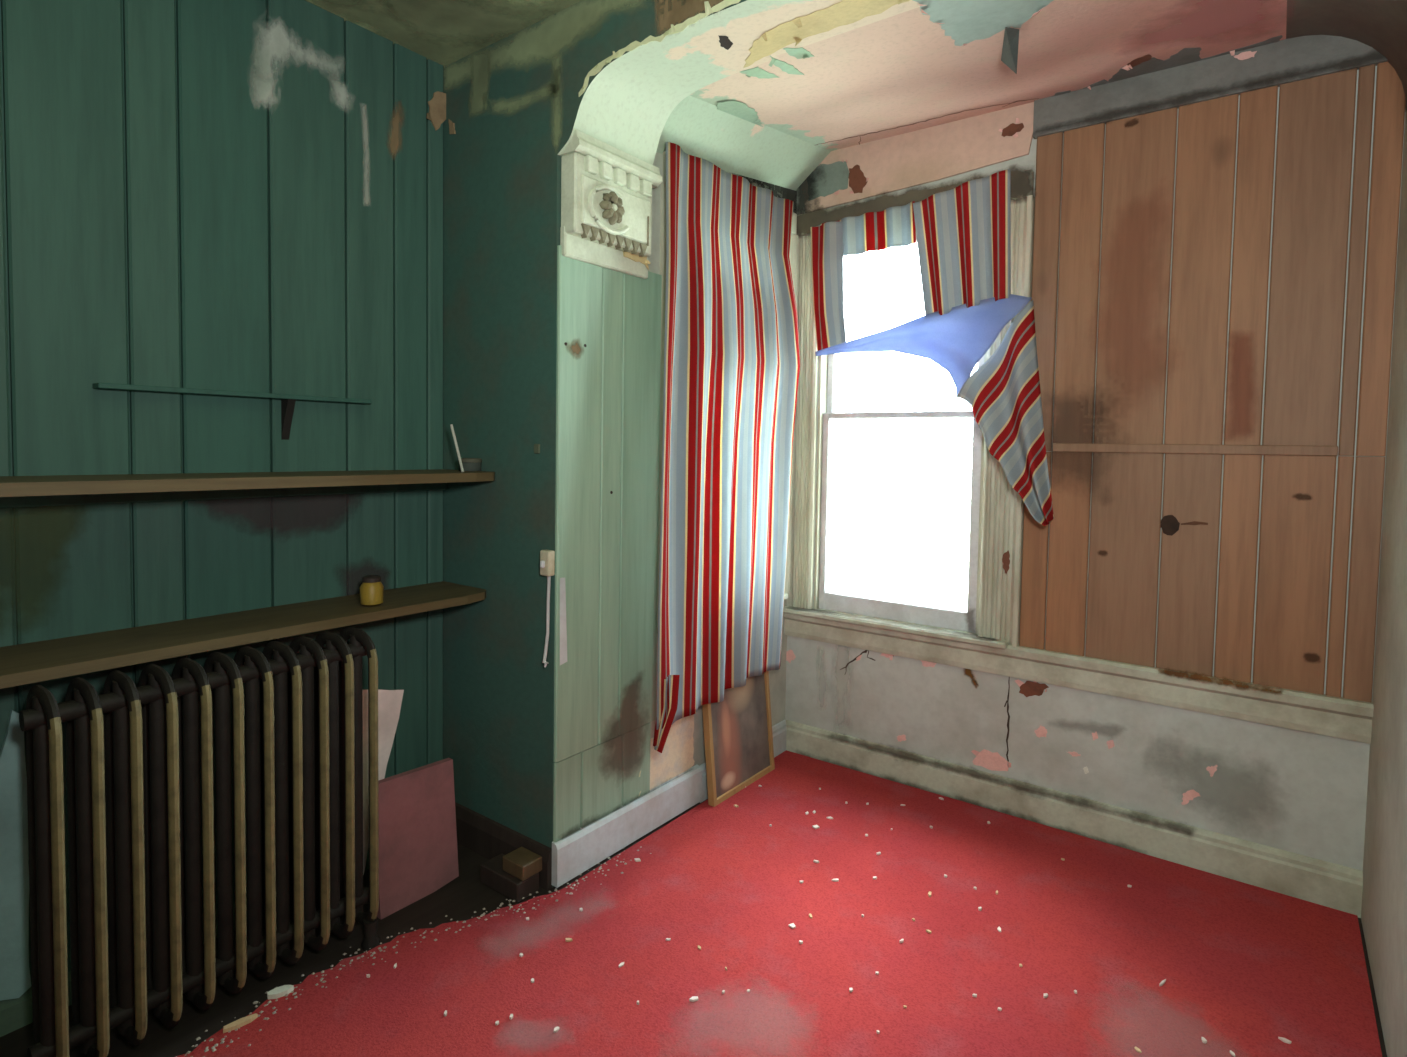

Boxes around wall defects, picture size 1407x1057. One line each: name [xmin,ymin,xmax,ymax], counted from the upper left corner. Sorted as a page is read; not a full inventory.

leakage [252,22,348,108]
leakage [313,0,724,147]
spalling [579,0,741,97]
peeling [740,0,1053,79]
peeling [1052,35,1283,97]
peeling [716,101,763,127]
spalling [998,118,1024,138]
peeling [811,159,869,200]
spalling [1015,679,1049,697]
crack [1003,677,1011,762]
peeling [971,749,1011,771]